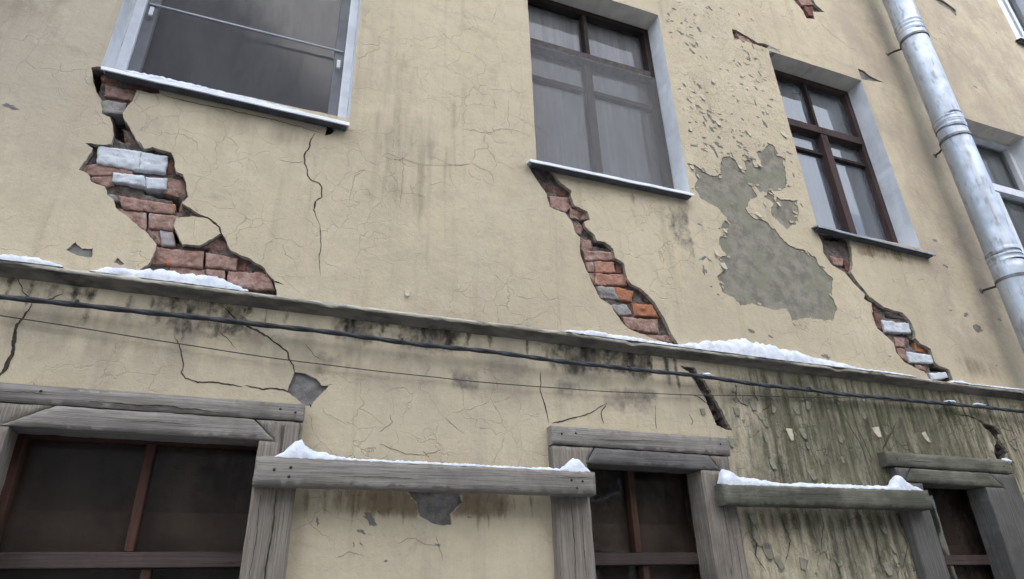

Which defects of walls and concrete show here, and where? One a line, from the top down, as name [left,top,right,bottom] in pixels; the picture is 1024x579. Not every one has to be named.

spalling [82,72,284,296]
crack [160,93,323,275]
peeling [678,33,849,326]
spalling [530,168,673,344]
crack [0,279,63,375]
crack [175,306,331,407]
flaking render [287,373,327,406]
damp [411,327,468,345]
crack [540,372,607,423]
damp [552,344,680,386]
crack [690,377,834,462]
spalling [864,298,948,382]